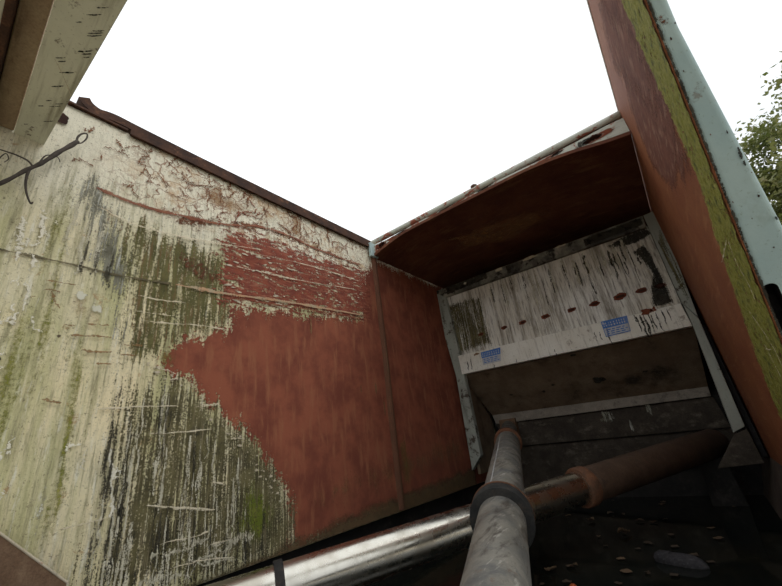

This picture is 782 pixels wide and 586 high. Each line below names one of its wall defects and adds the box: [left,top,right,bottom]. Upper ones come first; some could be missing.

crack [72,139,353,253]
peeling [147,208,488,545]
damp [83,377,265,586]